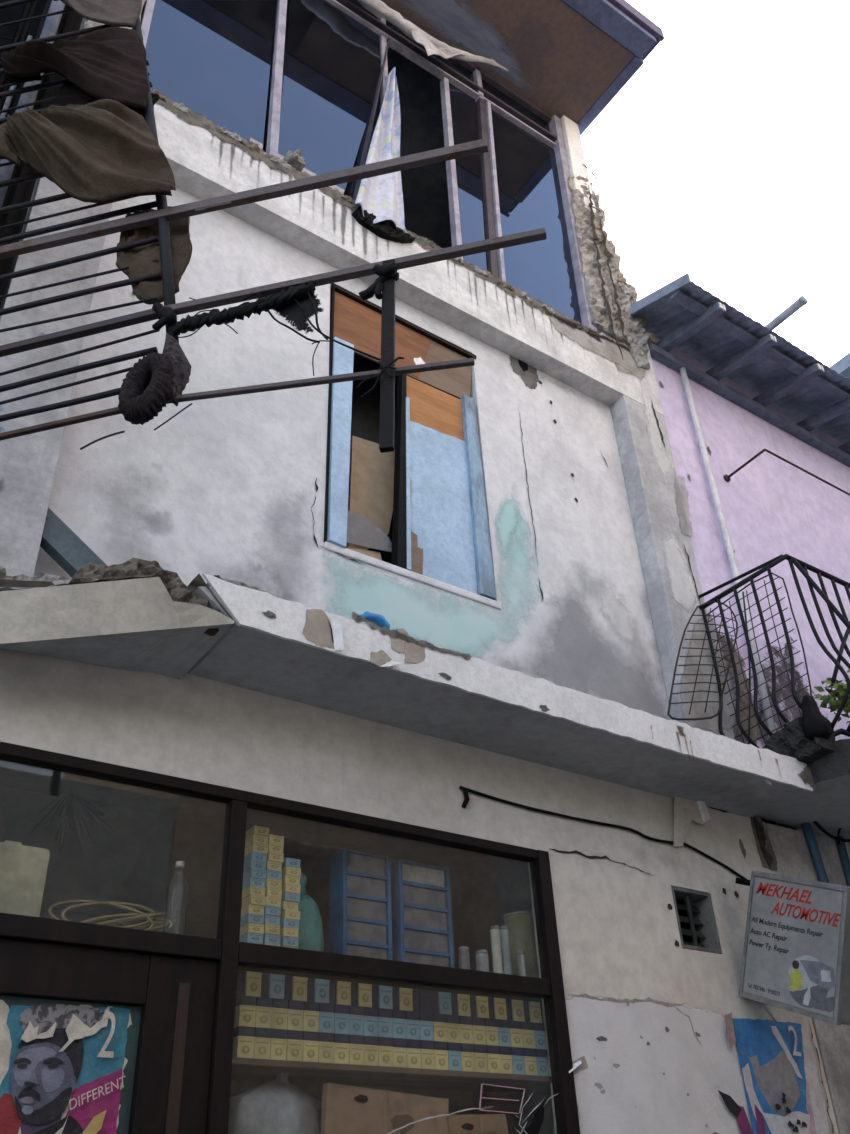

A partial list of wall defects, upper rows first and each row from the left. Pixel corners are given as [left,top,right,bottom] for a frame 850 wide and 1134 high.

spalling [151,89,313,180]
spalling [319,186,361,209]
spalling [389,164,696,609]
spalling [68,558,235,636]
peeling [303,609,471,667]
water stain [534,599,666,719]
peeling [680,614,759,743]
crack [551,849,654,876]